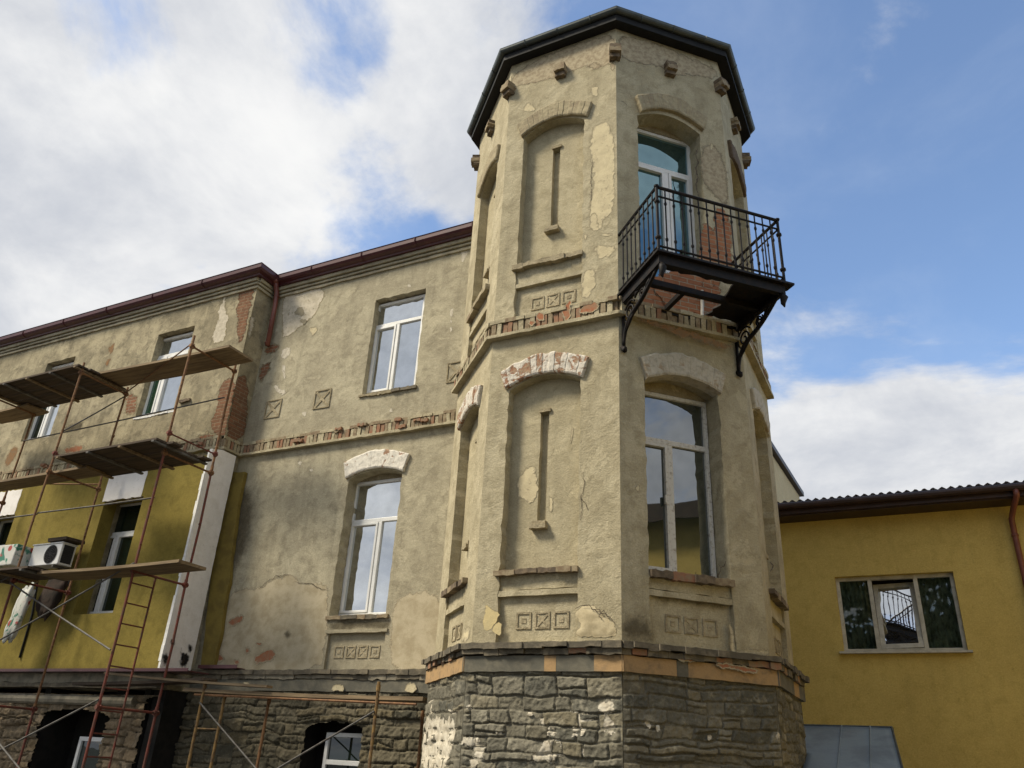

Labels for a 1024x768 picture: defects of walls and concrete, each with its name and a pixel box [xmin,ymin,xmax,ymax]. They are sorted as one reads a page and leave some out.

peeling [562,121,615,320]
peeling [211,293,229,343]
peeling [274,288,325,396]
peeling [516,466,553,512]
peeling [483,605,502,636]
peeling [421,699,486,768]